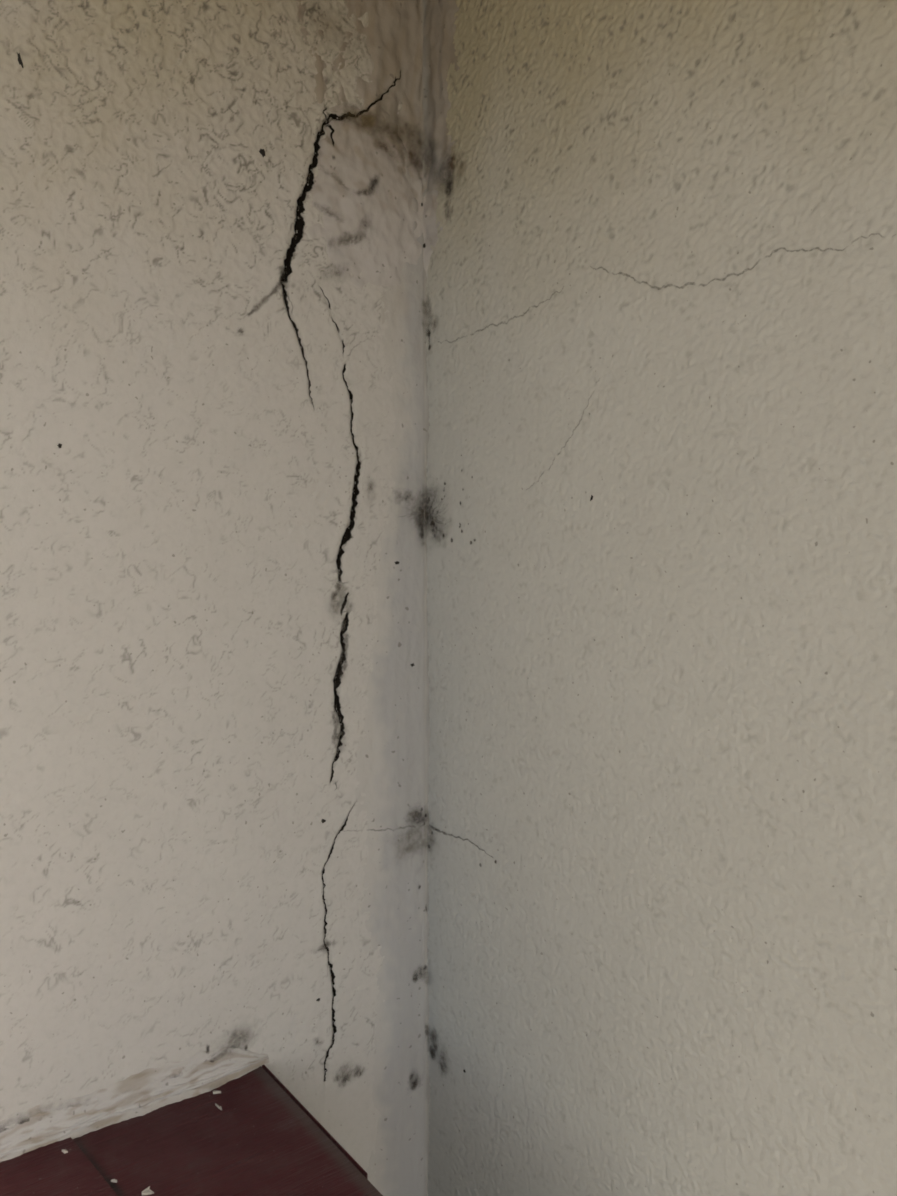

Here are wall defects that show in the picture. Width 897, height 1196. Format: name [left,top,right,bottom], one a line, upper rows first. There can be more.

crack [238,71,401,407]
water stain [419,483,476,544]
crack [316,287,372,1081]
crack [431,827,492,857]